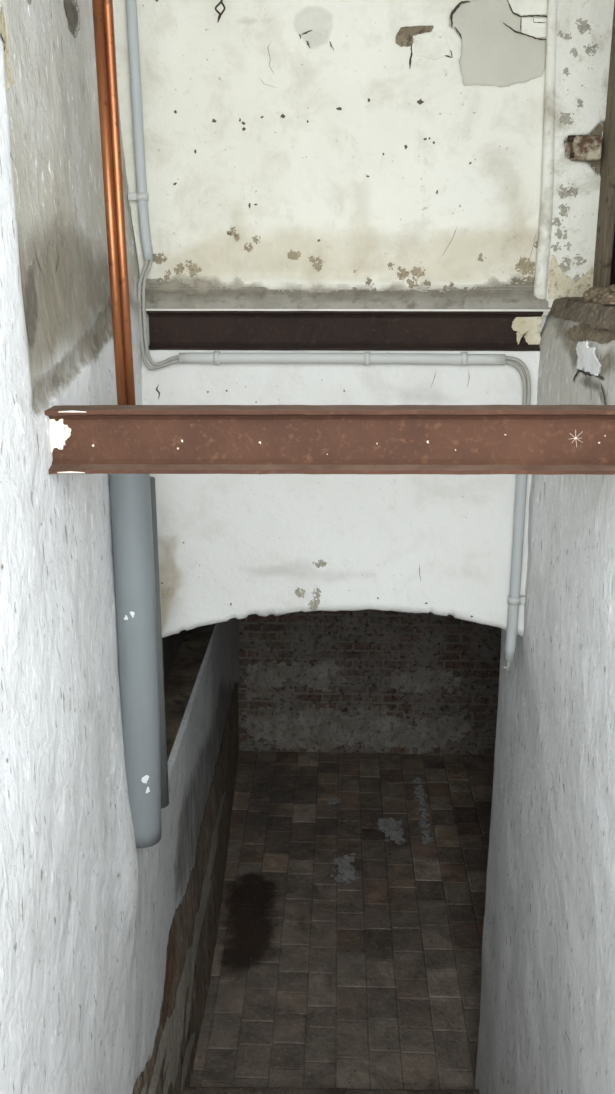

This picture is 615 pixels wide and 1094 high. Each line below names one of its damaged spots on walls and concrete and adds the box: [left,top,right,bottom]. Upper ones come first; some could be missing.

flaking render [395,0,599,87]
peeling [558,85,583,125]
water stain [152,279,265,296]
flaking render [565,323,615,344]
water stain [222,874,275,967]